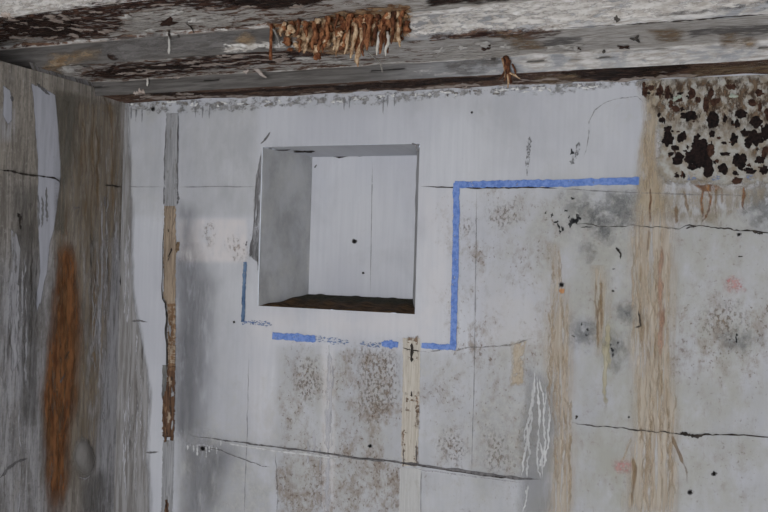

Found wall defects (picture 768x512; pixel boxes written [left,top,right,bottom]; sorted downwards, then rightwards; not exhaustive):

peeling [121,9,235,33]
peeling [408,0,768,35]
peeling [223,40,360,66]
flaking render [125,82,613,114]
rust [43,35,768,219]
damp [545,210,587,233]
crack [573,223,768,235]
damp [616,83,683,511]
rust [43,247,80,502]
damp [521,280,571,512]
crack [575,415,768,439]
crack [195,436,534,482]